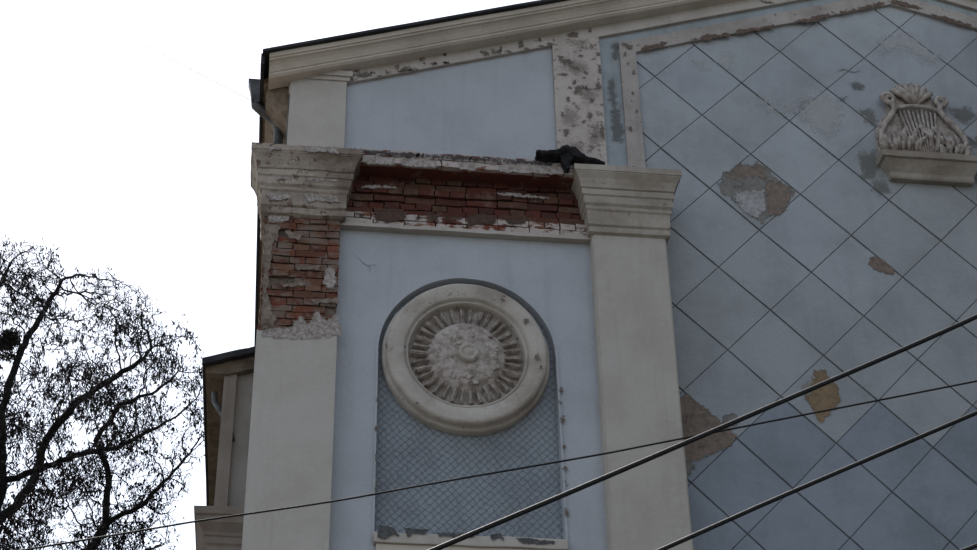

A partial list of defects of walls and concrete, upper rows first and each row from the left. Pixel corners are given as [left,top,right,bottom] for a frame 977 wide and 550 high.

peeling [796,0,971,27]
peeling [690,24,775,41]
peeling [621,41,667,74]
peeling [557,52,605,140]
spalling [717,161,795,224]
flaking render [257,148,586,340]
spalling [868,255,894,274]
spalling [803,369,841,423]
spalling [680,394,738,475]
peeling [377,525,478,539]
peeling [490,533,555,545]